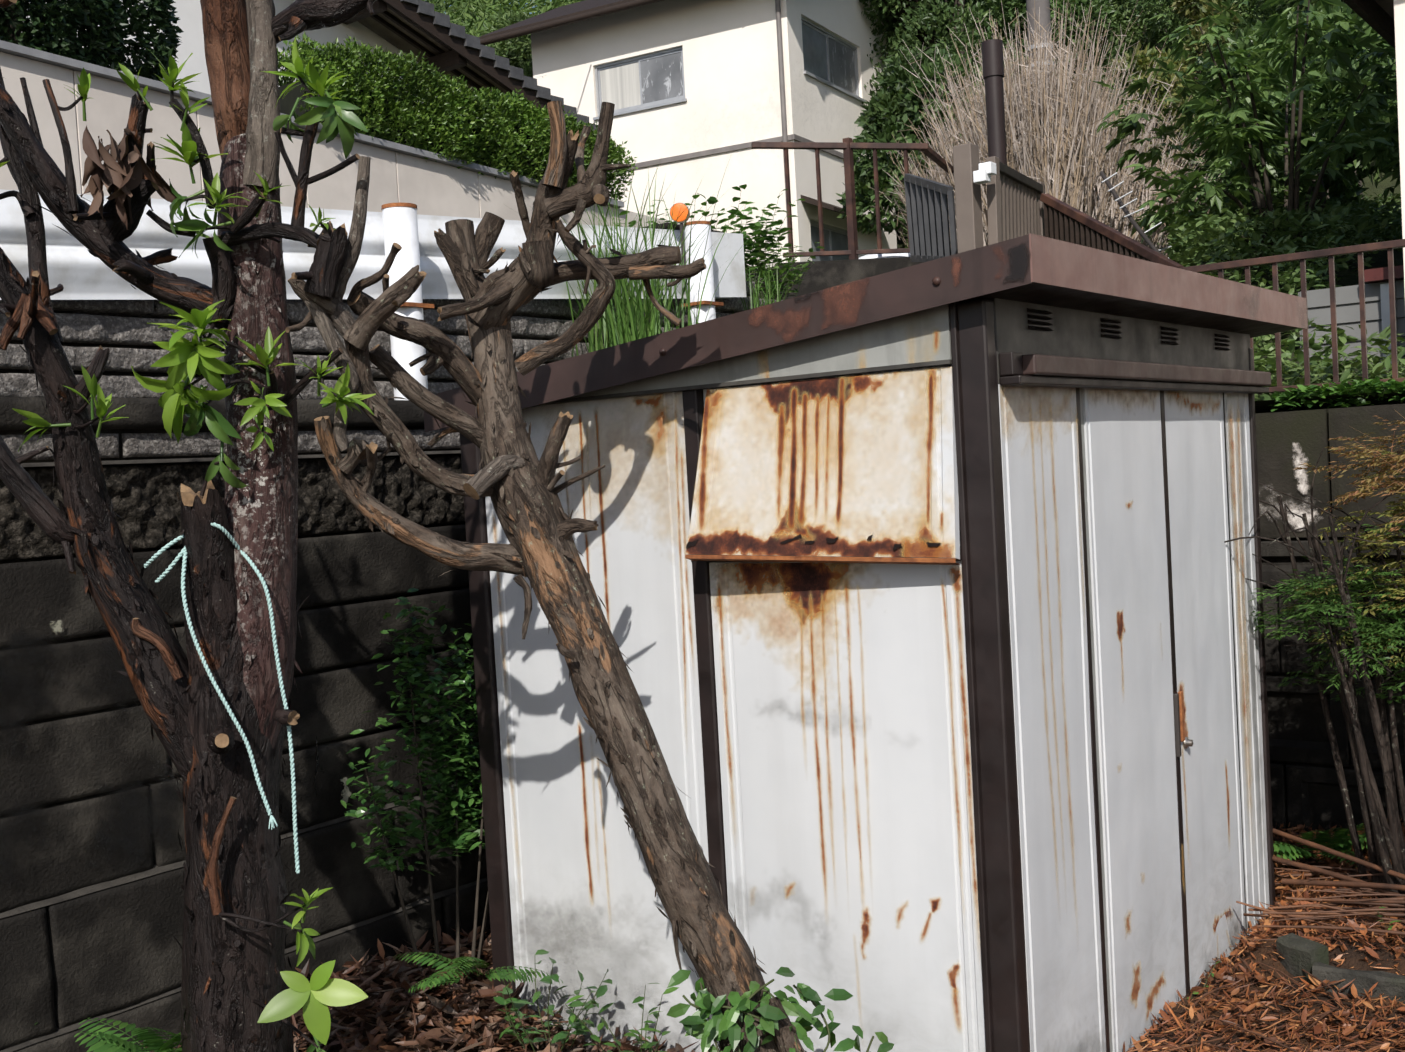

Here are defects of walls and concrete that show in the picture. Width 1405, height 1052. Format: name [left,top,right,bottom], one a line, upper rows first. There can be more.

rust [563,413,609,625]
rust [635,369,977,901]
rust [1117,612,1125,652]
rust [578,725,603,898]
rust [861,908,870,957]
rust [922,899,940,938]
rust [948,964,960,1025]
rust [1132,966,1164,1017]